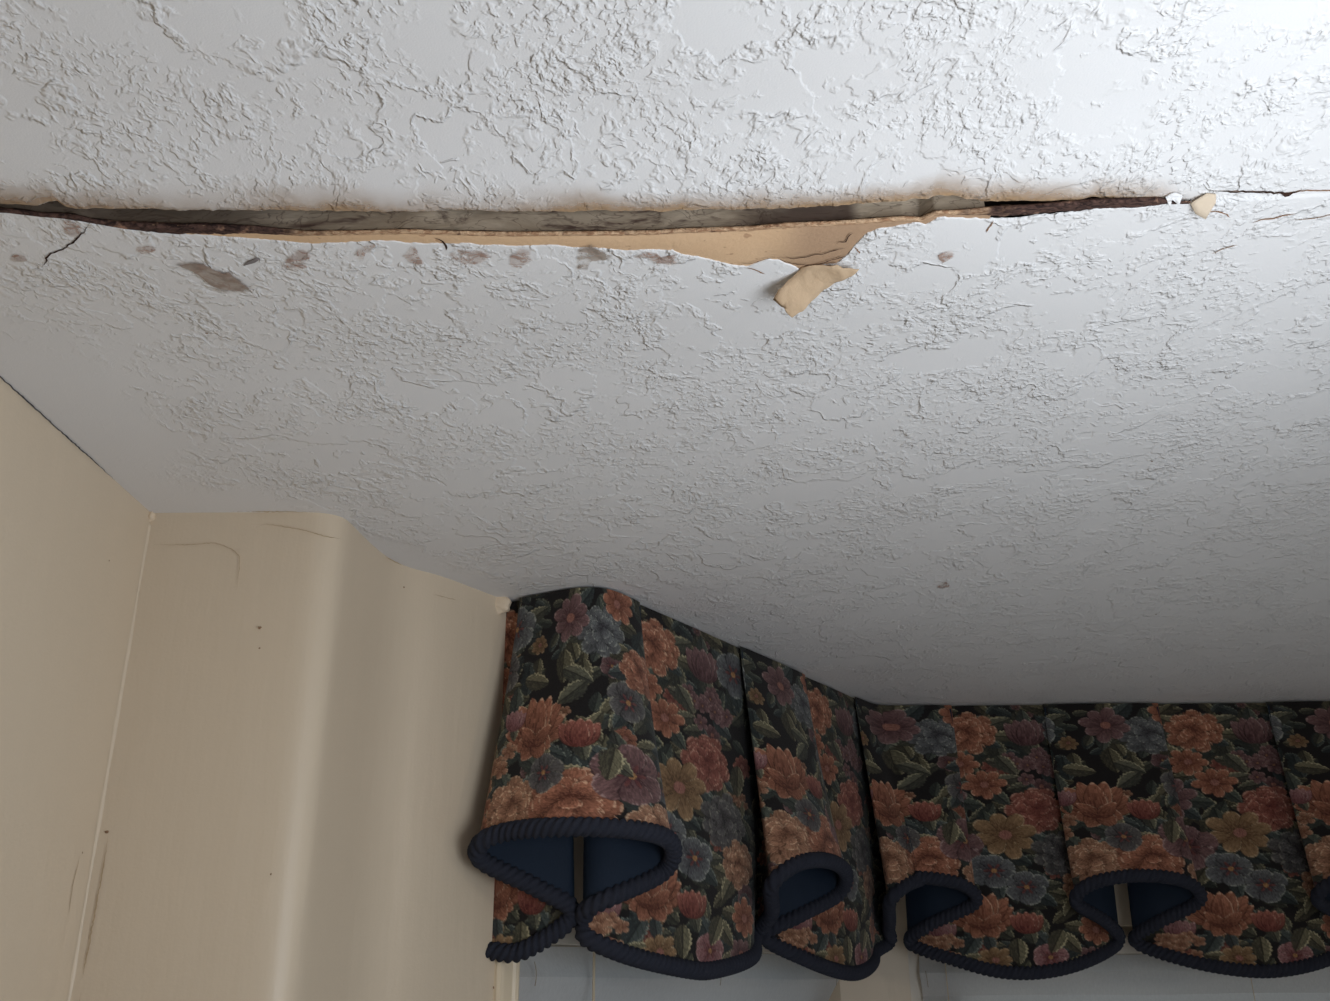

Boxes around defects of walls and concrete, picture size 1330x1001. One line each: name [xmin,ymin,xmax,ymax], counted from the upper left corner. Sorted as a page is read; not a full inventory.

crack [0,190,1330,265]
spalling [179,258,260,292]
crack [0,376,112,477]